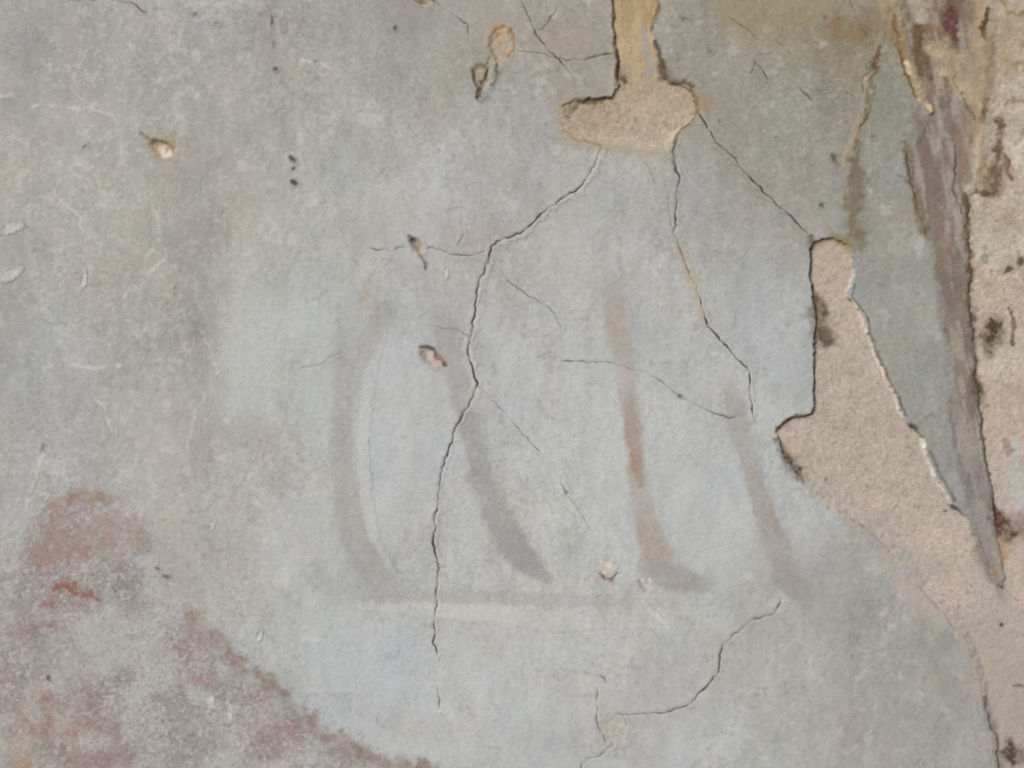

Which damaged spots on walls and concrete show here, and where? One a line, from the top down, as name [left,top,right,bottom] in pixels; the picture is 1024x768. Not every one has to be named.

peeling [470,19,519,104]
flaking render [549,0,723,161]
peeling [138,131,179,164]
peeling [405,234,430,271]
crack [668,105,809,425]
peeling [416,341,453,375]
crack [428,139,607,662]
flaking render [769,0,1024,768]
crack [683,648,722,707]